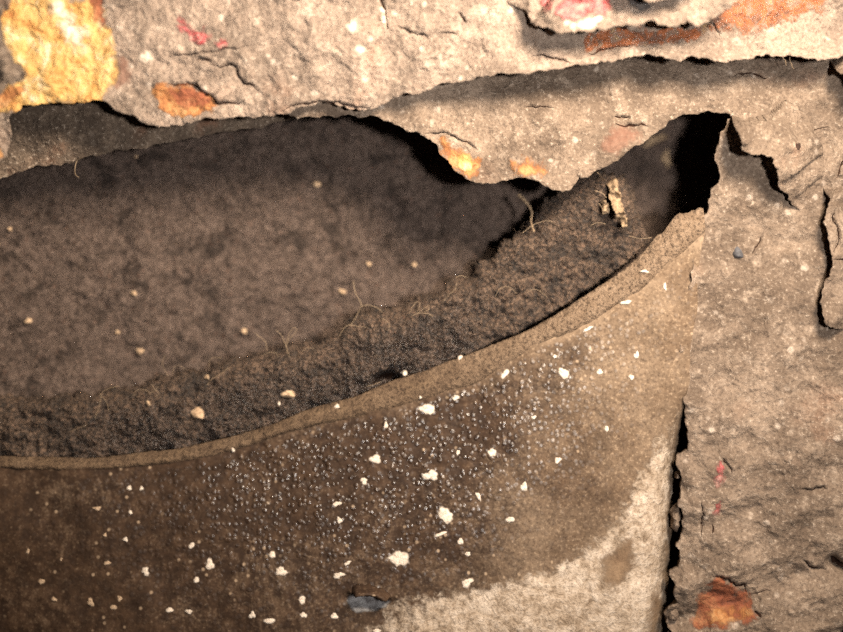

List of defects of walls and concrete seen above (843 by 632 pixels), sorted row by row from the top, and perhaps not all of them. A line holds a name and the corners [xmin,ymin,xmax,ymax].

corrosion [506,0,825,52]
corrosion [0,0,119,112]
corrosion [152,73,239,118]
crack [167,45,258,105]
crack [282,100,370,111]
crack [532,54,572,63]
crack [591,44,634,55]
crack [615,116,647,127]
crack [732,71,766,79]
crack [832,211,843,260]
leakage [606,539,632,584]
corrosion [692,576,756,630]